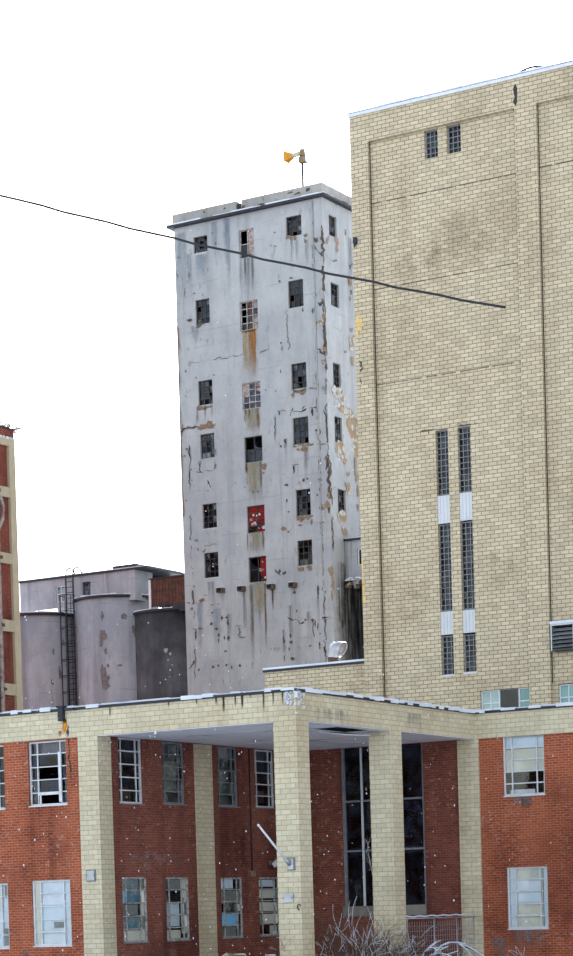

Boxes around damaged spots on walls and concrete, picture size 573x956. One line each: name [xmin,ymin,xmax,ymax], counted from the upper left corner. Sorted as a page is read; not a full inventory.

crack [189,311,290,363]
rust [243,329,255,363]
crack [274,225,353,662]
peeling [280,385,360,537]
peeling [99,610,122,690]